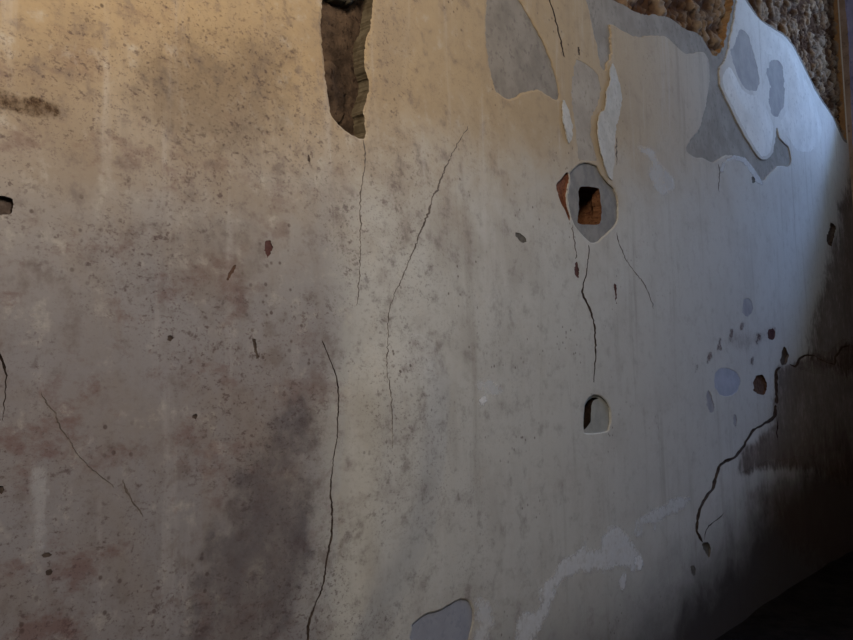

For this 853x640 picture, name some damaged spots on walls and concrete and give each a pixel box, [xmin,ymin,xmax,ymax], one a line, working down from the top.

flaking render [318,0,376,141]
flaking render [483,0,573,143]
flaking render [556,0,853,246]
crack [0,354,8,420]
crack [41,392,143,516]
crack [306,341,339,640]
crack [386,126,468,447]
crack [571,227,597,380]
crack [695,351,840,542]
damp [739,180,853,483]
flaking render [409,598,475,640]
damp [516,497,688,640]